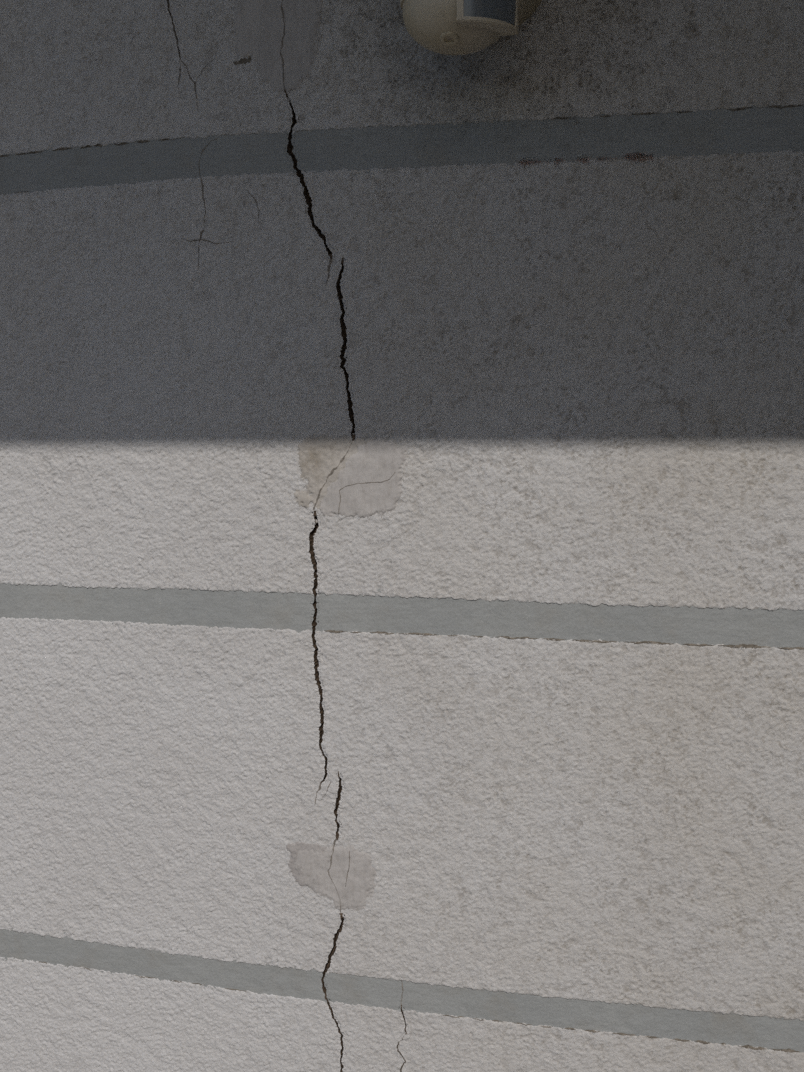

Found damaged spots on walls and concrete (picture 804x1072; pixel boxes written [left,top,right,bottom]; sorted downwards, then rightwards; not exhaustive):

crack [167,0,215,110]
crack [184,138,231,268]
crack [280,0,394,1072]